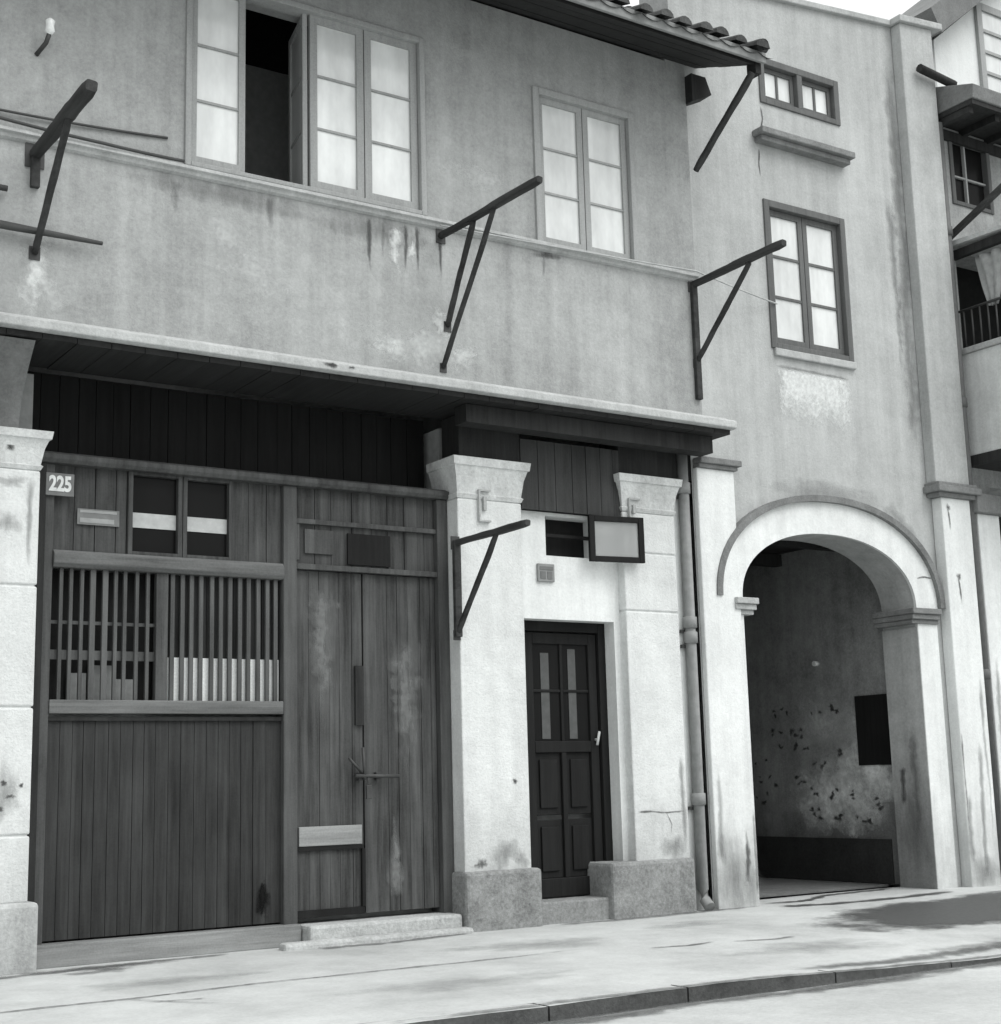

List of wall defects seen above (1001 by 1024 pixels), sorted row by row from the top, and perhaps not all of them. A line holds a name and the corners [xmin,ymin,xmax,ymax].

efflorescence [19,255,57,306]